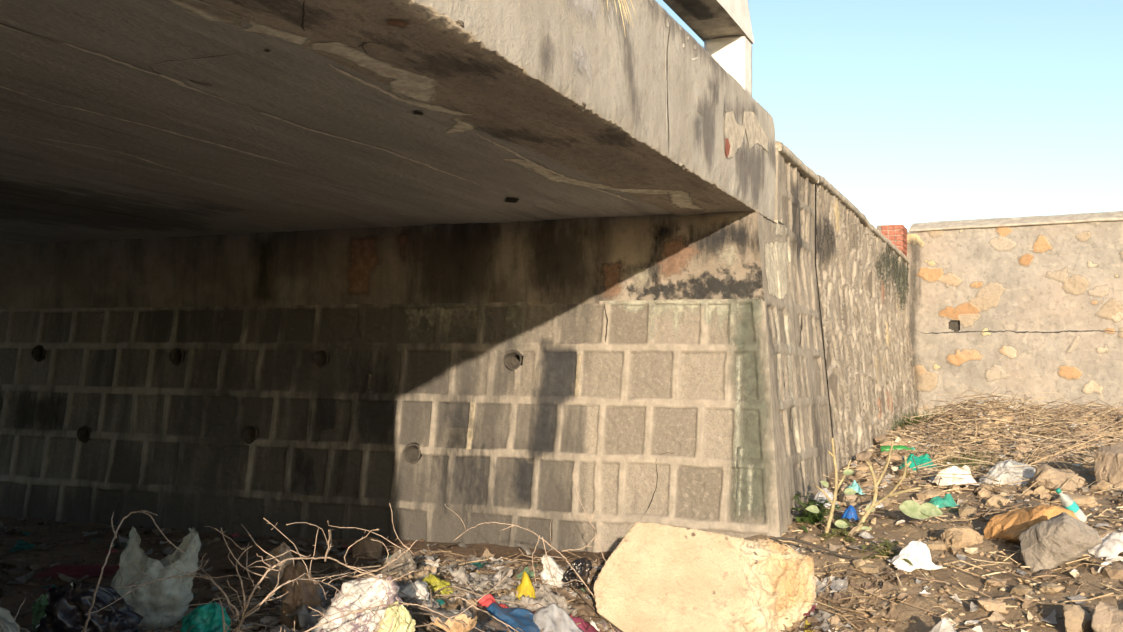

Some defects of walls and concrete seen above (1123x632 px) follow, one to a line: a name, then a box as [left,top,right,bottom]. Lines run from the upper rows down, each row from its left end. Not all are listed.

flaking render [724,100,769,159]
leakage [502,159,703,209]
leakage [690,223,759,266]
crack [916,328,1123,336]